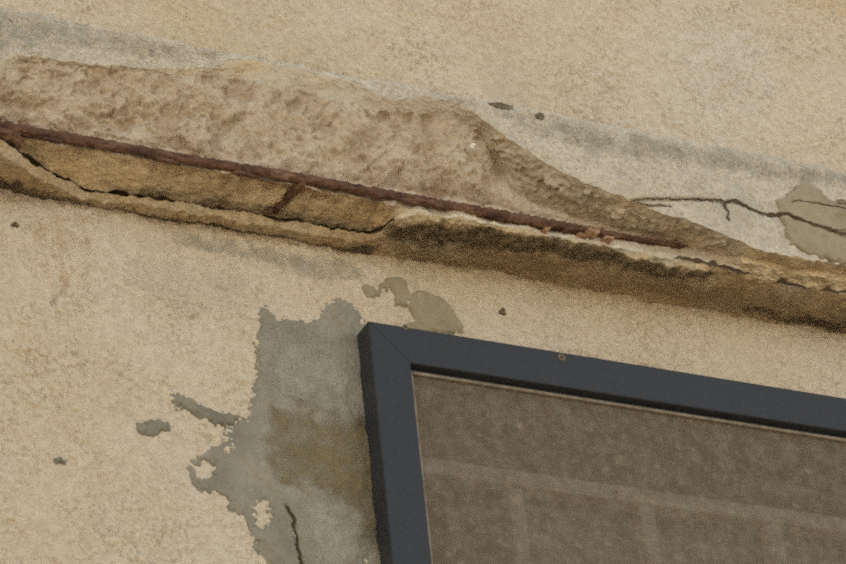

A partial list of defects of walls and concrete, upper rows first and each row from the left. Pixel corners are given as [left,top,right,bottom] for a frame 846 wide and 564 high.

crack [0,139,395,234]
spalling [0,51,846,291]
crack [633,197,846,237]